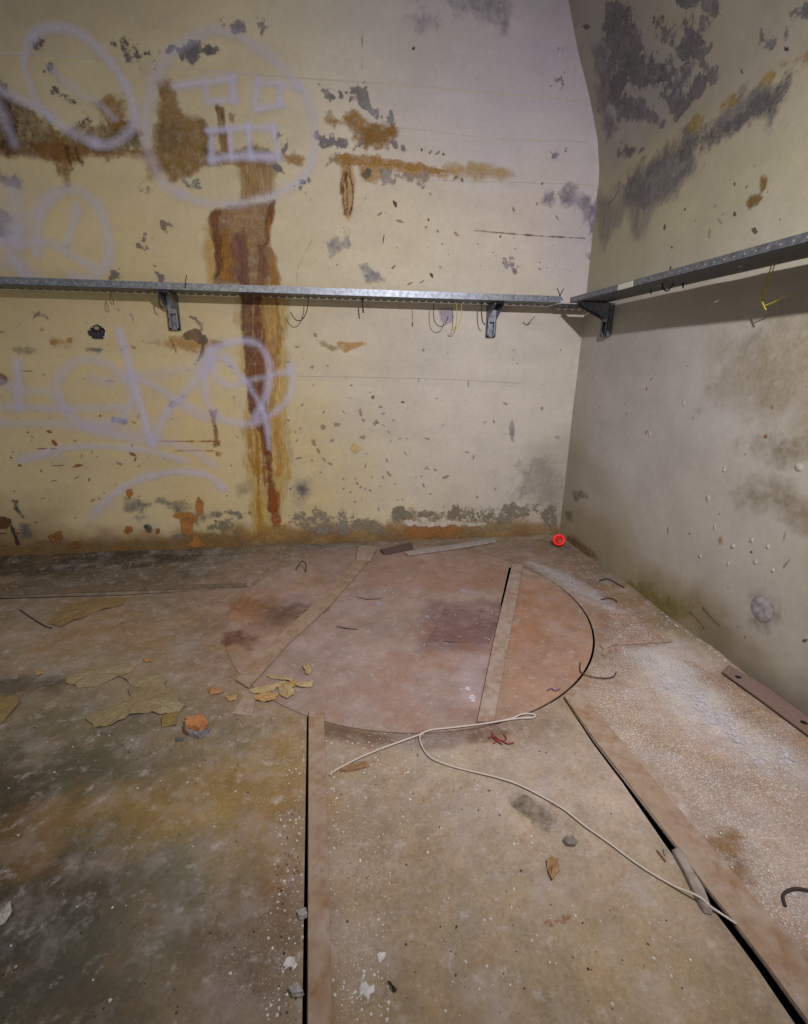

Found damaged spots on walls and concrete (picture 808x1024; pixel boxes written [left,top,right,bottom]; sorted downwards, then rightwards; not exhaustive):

peeling [110,37,219,71]
peeling [318,81,395,126]
peeling [313,130,364,151]
rust [327,111,506,217]
leakage [601,83,787,233]
rust [208,154,303,542]
peeling [27,417,98,481]
leakage [0,499,570,556]